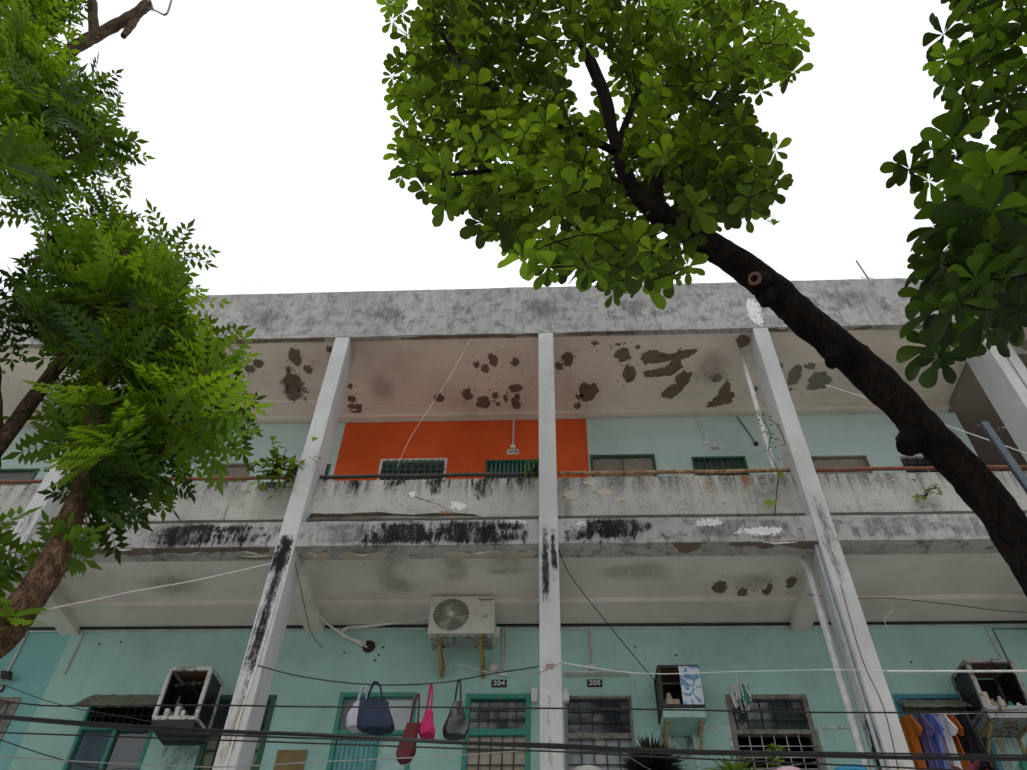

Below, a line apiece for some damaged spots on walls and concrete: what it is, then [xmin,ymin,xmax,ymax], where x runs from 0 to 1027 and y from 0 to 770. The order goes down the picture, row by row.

spalling [398,333,538,343]
peeling [231,338,333,404]
peeling [461,351,529,410]
peeling [554,331,735,409]
peeling [780,362,840,394]
damp [322,520,528,549]
damp [540,518,653,594]
peeling [705,572,798,597]
damp [149,523,293,747]